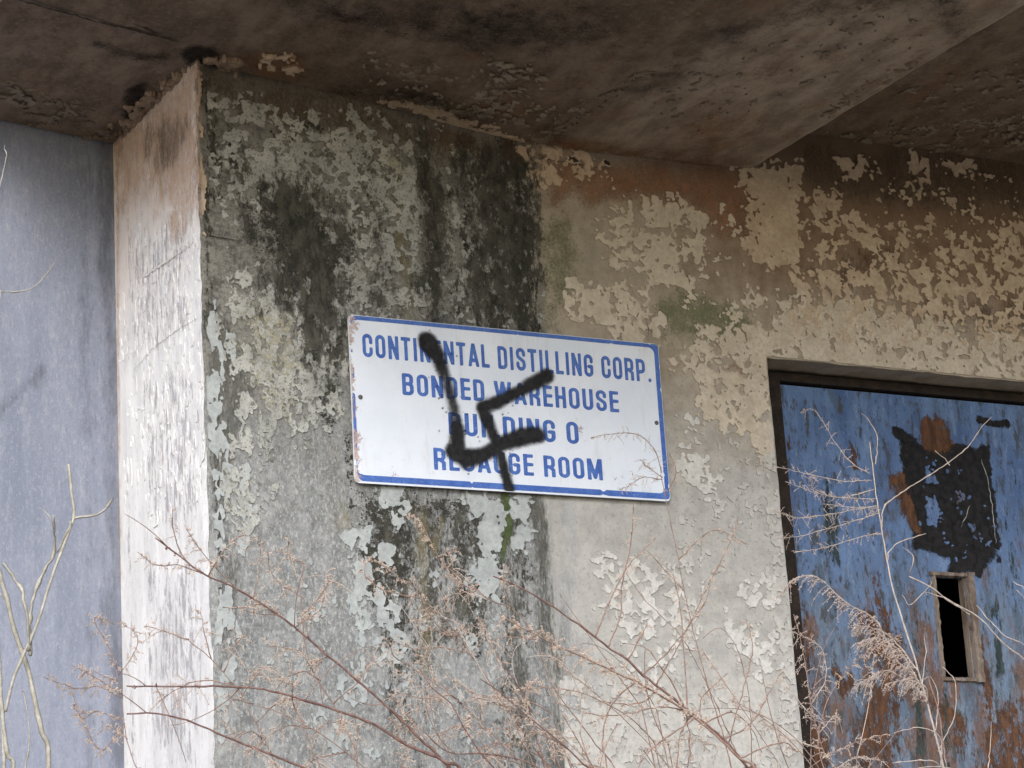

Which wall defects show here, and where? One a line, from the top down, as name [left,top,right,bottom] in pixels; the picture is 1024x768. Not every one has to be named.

peeling [107,49,615,558]
leakage [363,119,754,334]
peeling [212,570,249,744]
leakage [135,47,576,768]
peeling [419,490,539,700]
peeling [559,148,1024,768]
corrosion [801,605,834,768]
corrosion [831,664,855,697]
corrosion [848,572,907,768]
corrosion [887,472,921,535]
corrosion [919,412,954,454]
corrosion [929,634,1024,768]